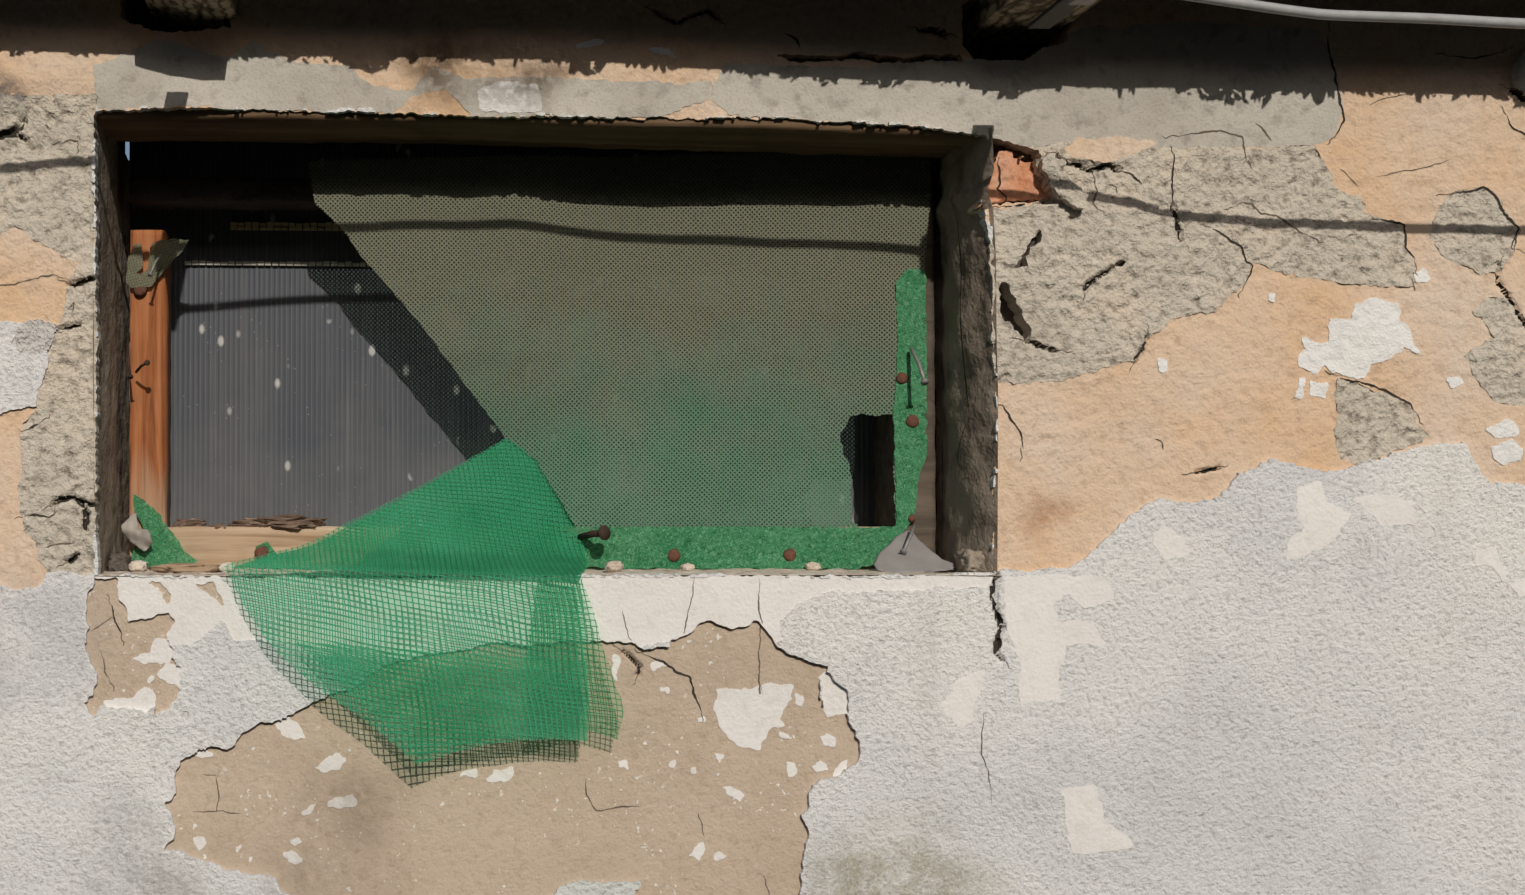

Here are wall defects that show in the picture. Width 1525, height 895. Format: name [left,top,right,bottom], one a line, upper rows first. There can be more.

crack [907,24,958,38]
flaking render [0,0,1525,715]
crack [951,123,1322,475]
flaking render [165,620,859,895]
crack [990,579,1011,669]